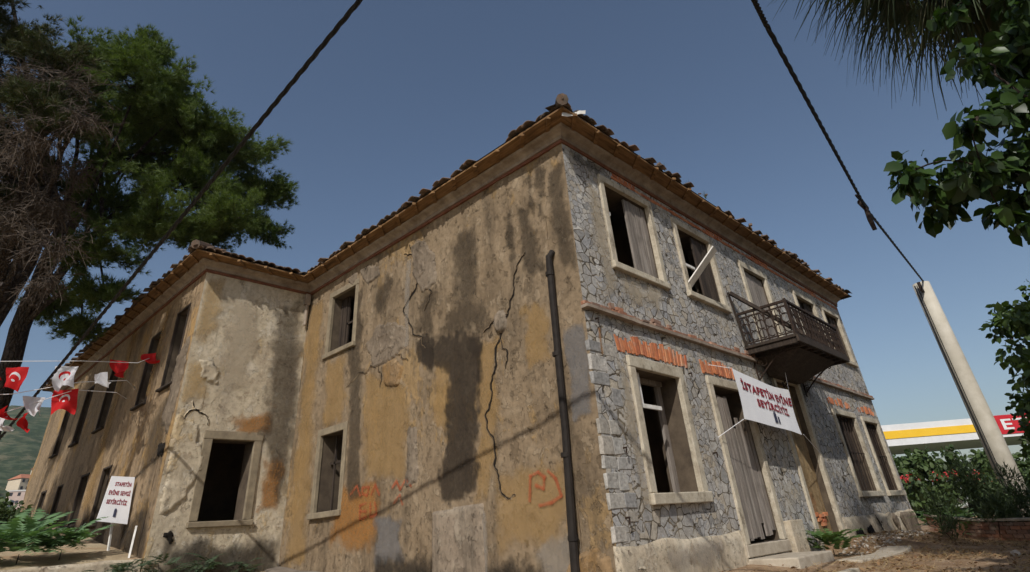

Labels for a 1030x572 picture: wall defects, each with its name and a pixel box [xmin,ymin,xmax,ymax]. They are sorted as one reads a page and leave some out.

crack [346,245,432,388]
water stain [417,234,494,501]
crack [483,253,525,501]